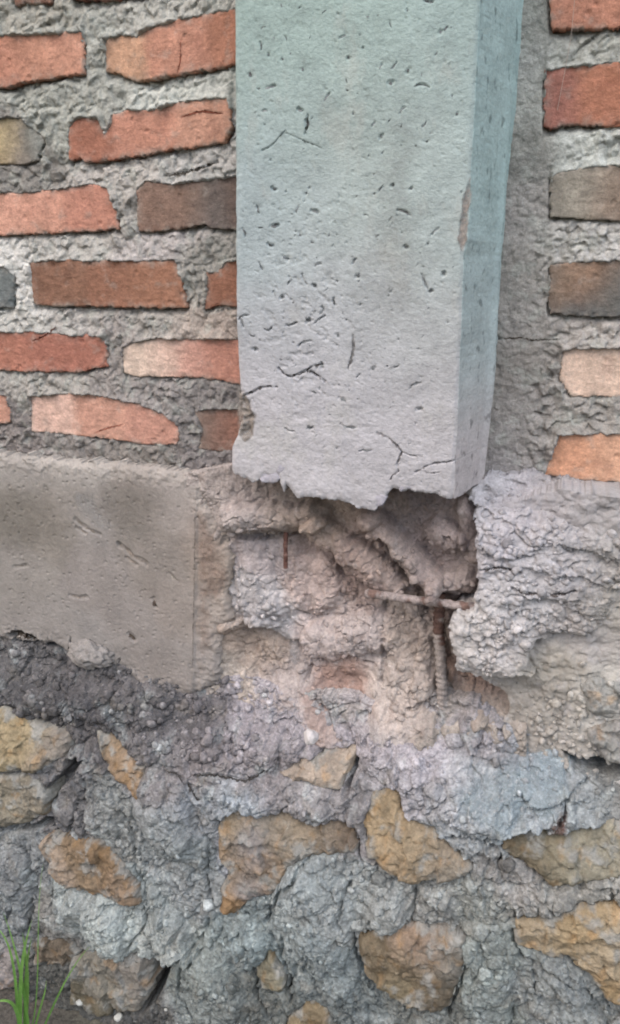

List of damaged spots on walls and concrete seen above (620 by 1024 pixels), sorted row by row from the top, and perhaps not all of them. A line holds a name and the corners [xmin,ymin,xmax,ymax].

crack [377,433,454,480]
spalling [183,463,620,757]